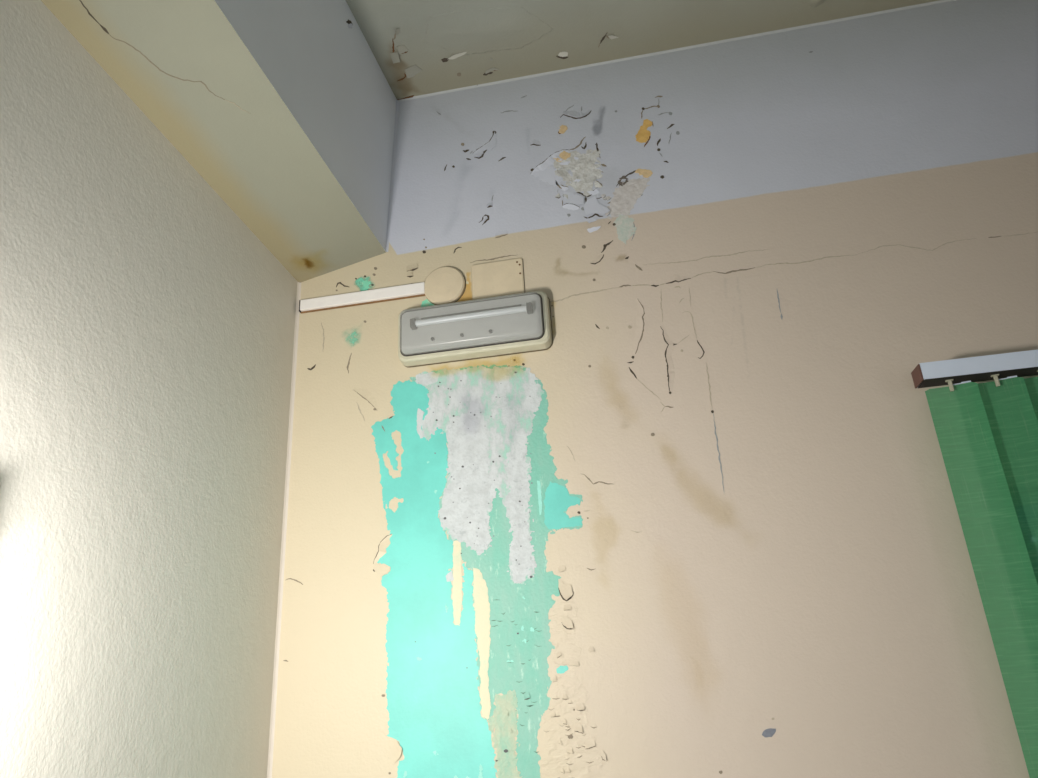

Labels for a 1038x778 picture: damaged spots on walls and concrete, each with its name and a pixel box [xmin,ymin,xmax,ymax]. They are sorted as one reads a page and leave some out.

crack [79,0,250,114]
peeling [558,105,591,134]
peeling [635,96,663,147]
peeling [530,137,653,245]
crack [550,232,1036,491]
peeling [371,364,606,778]